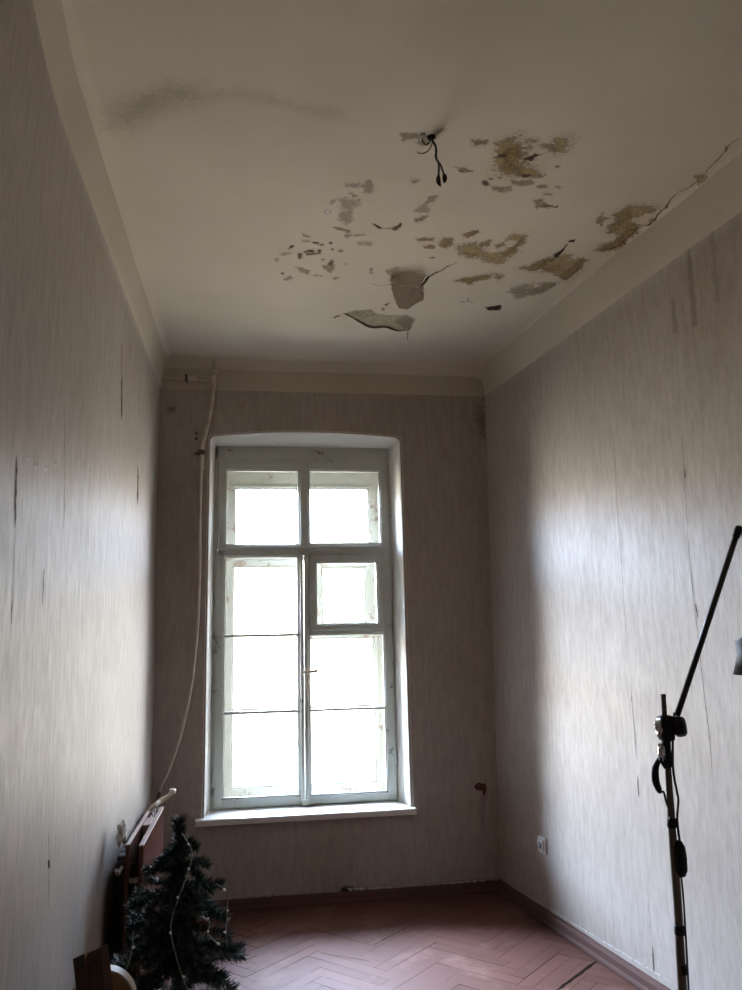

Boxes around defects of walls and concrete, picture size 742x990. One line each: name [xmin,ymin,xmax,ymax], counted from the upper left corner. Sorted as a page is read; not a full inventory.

flaking render [325,180,373,238]
peeling [482,177,560,208]
crack [644,138,739,226]
peeling [275,234,342,280]
peeling [334,265,450,340]